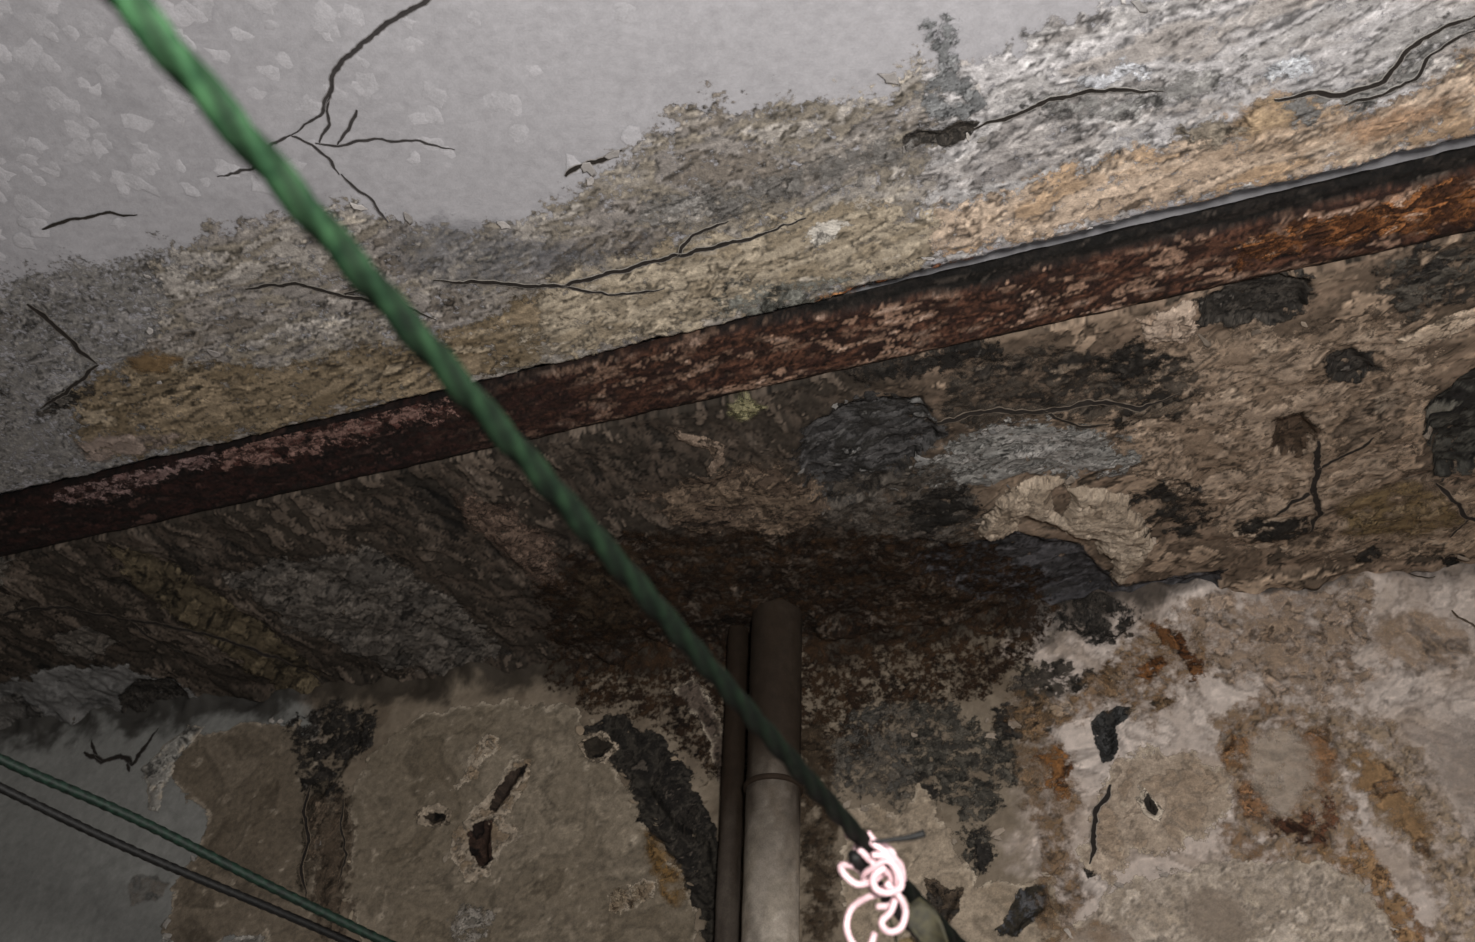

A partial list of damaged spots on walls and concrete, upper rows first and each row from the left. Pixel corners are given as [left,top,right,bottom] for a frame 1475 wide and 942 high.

crack [42,210,137,230]
crack [217,0,455,223]
peeling [323,0,1475,382]
crack [974,86,1164,130]
rust [1229,176,1475,272]
crack [1274,15,1475,106]
peeling [789,268,1475,605]
mould [1129,479,1212,539]
peeling [341,697,719,942]
leakage [453,488,725,786]
leakage [606,455,1141,942]
peeling [836,698,1401,942]